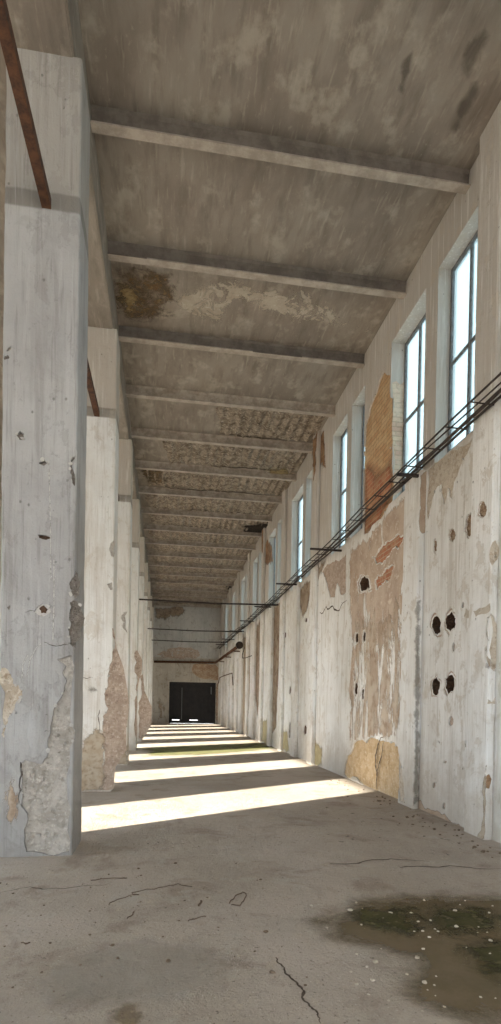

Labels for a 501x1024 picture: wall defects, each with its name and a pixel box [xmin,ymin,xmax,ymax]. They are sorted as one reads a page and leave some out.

leakage [115,267,347,327]
flaking render [427,441,472,519]
flaking render [323,373,409,802]
flaking render [0,668,23,737]
flaking render [21,571,85,855]
spalling [99,612,152,790]
crack [330,859,481,869]
crack [275,957,321,1023]
leakage [314,896,501,1022]